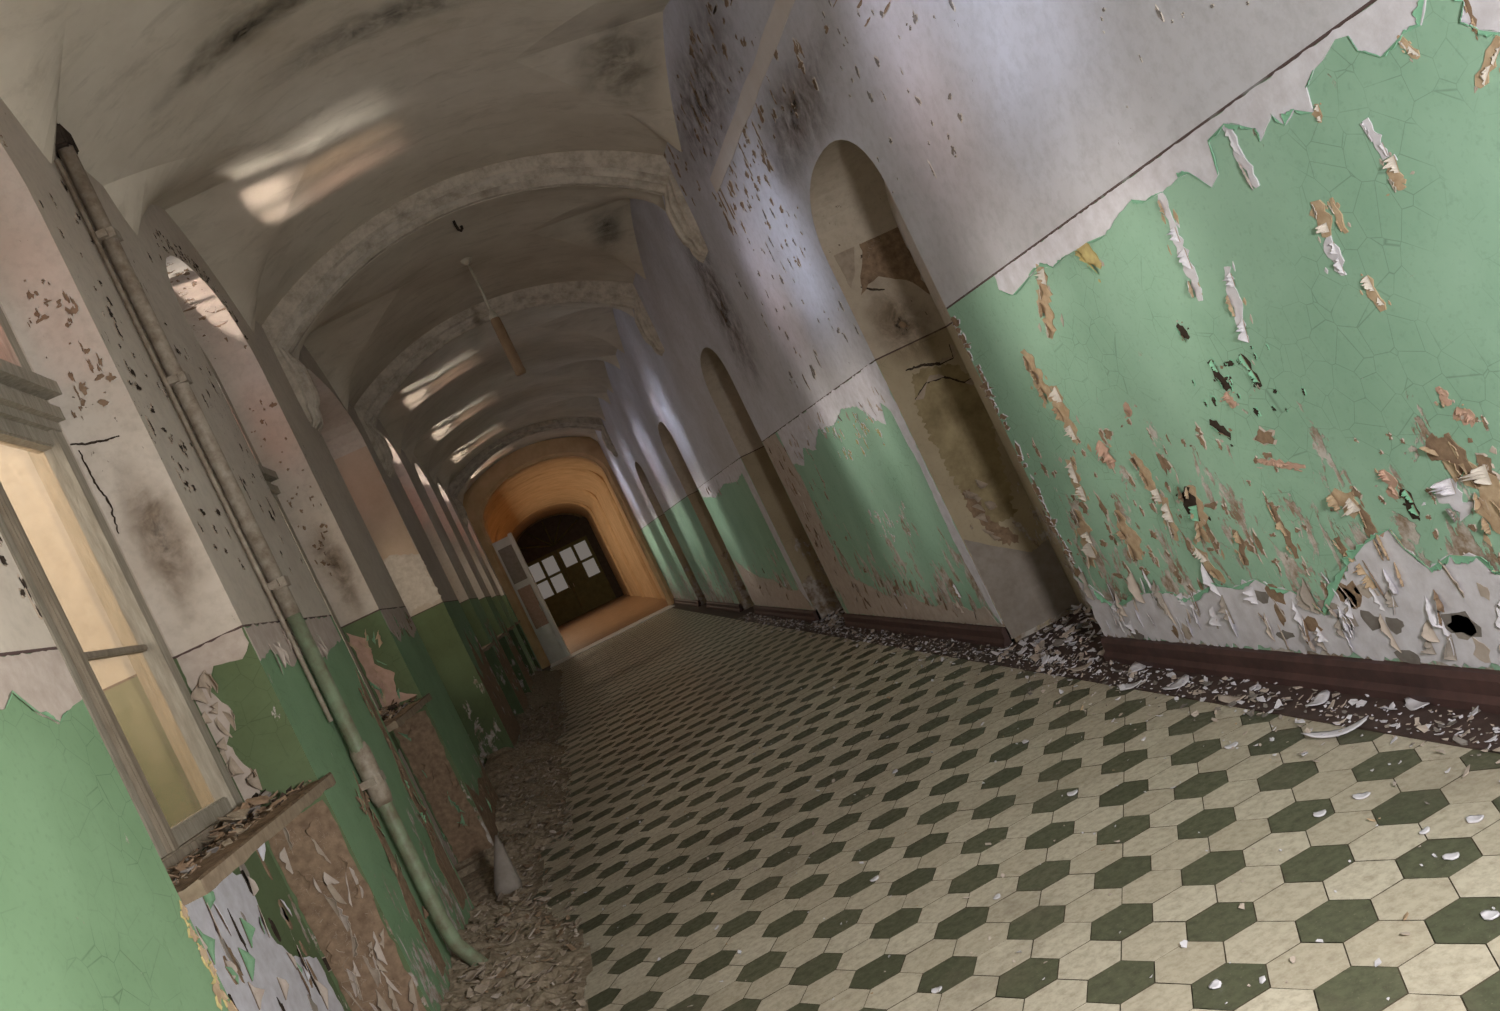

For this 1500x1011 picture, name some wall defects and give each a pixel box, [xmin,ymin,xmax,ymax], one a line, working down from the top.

damp [221,5,277,52]
damp [778,77,815,146]
peeling [664,0,1500,782]
spalling [0,537,43,620]
peeling [0,650,82,724]
peeling [177,607,499,910]
flaking render [179,800,427,1011]